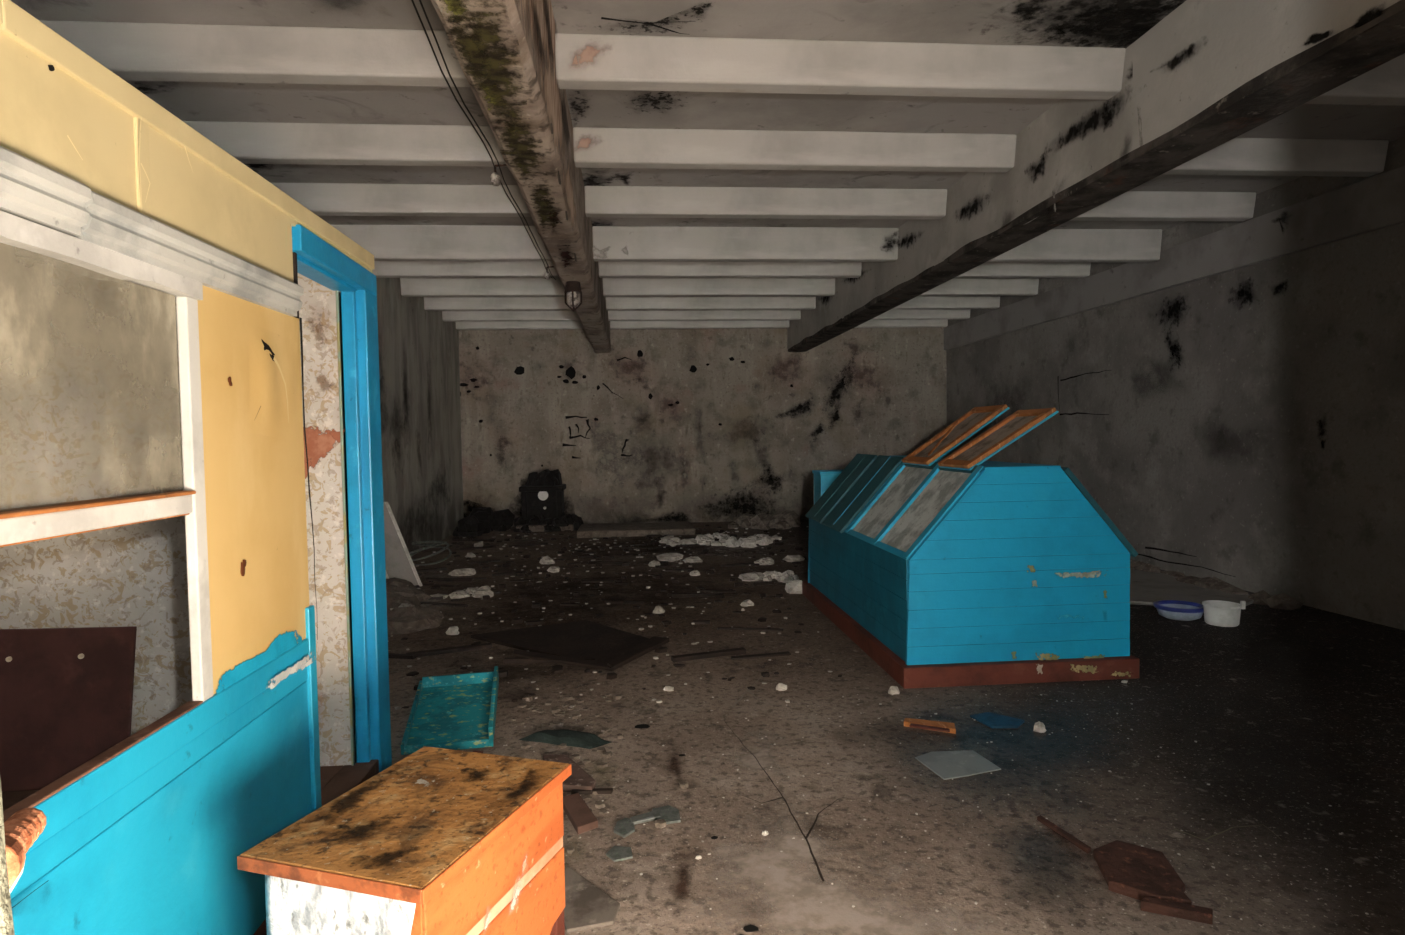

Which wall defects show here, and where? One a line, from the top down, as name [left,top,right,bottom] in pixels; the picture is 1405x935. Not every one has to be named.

leakage [1000,0,1186,79]
leakage [1161,44,1195,70]
leakage [519,0,630,227]
leakage [632,91,683,112]
leakage [1025,98,1121,183]
leakage [1228,278,1253,308]
leakage [1156,297,1187,367]
leakage [779,357,854,442]
leakage [620,495,688,523]
leakage [704,460,782,520]